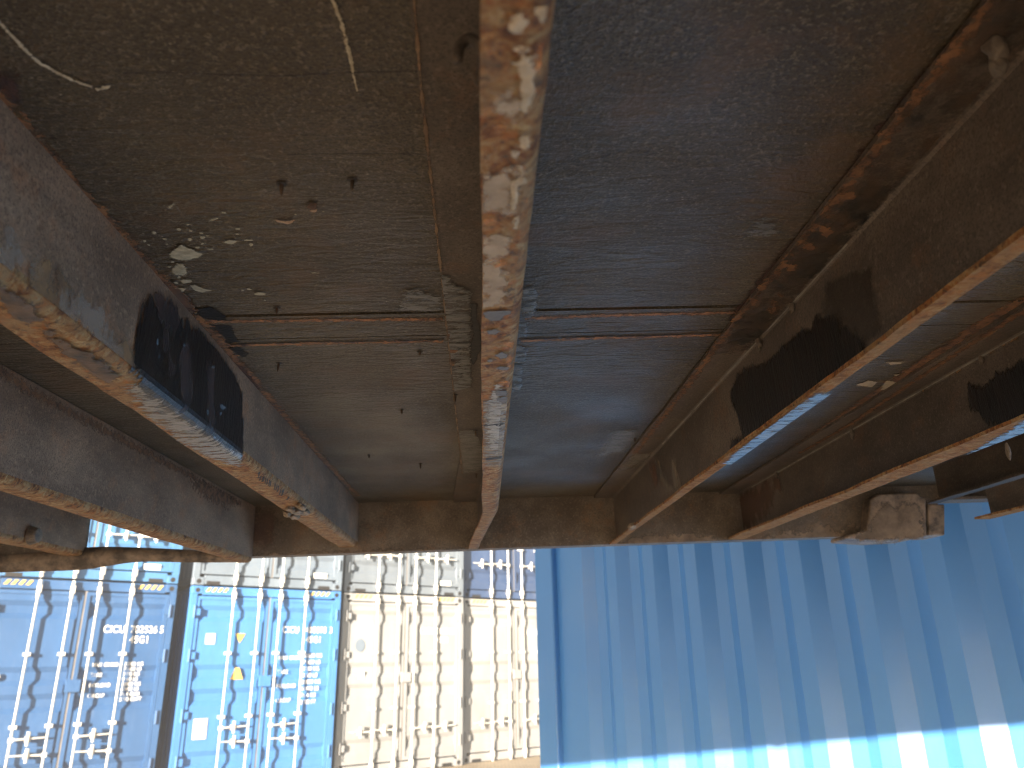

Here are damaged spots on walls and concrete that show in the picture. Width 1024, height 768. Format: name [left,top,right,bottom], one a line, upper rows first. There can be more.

peeling [508,5,547,113]
peeling [143,224,213,292]
peeling [510,135,531,229]
corrosion [504,0,993,454]
spalling [470,304,512,371]